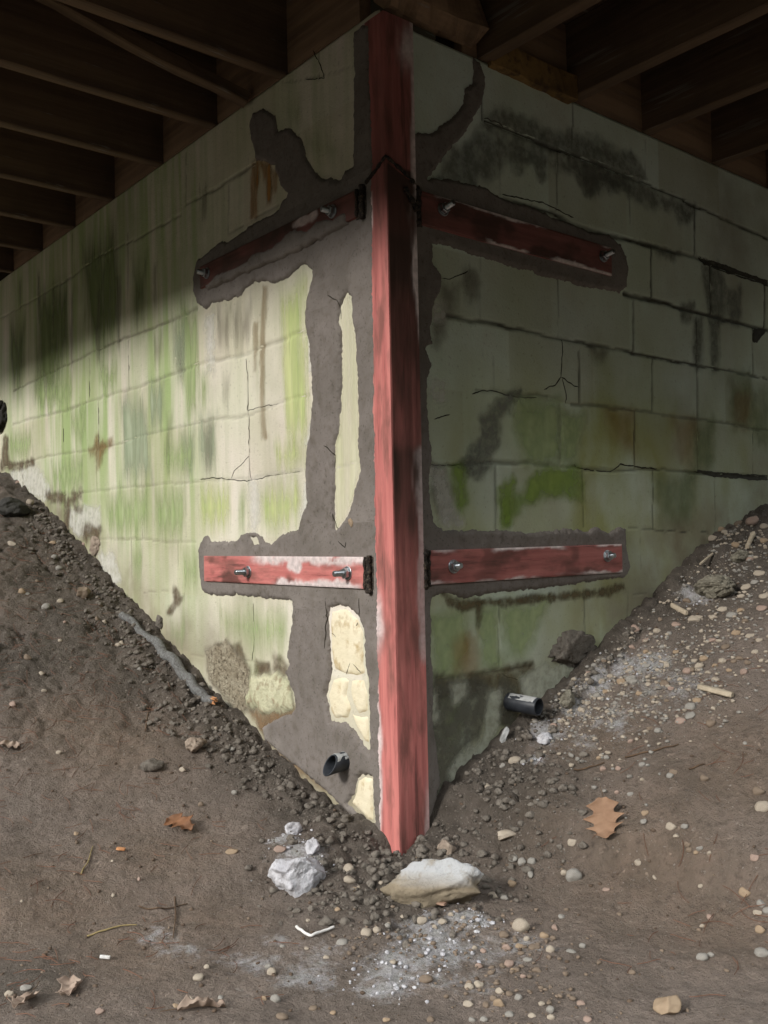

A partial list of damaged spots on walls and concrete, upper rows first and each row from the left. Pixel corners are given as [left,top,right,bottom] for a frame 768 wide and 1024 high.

water stain [444,112,695,222]
crack [502,194,574,218]
crack [472,340,579,403]
peeling [11,466,49,500]
corrosion [93,437,112,462]
crack [200,361,295,482]
peeling [336,300,359,524]
water stain [459,391,521,476]
crack [574,463,655,472]
peeling [98,554,121,583]
peeling [329,609,369,742]
peeling [353,777,374,819]